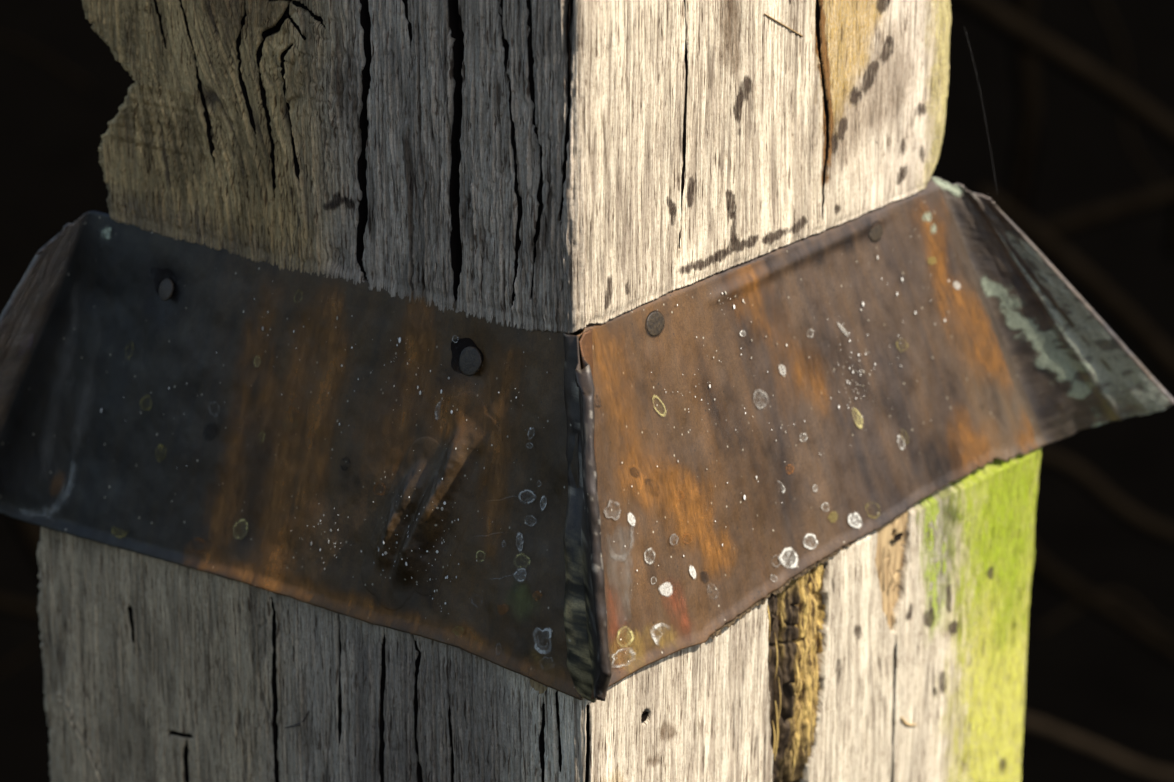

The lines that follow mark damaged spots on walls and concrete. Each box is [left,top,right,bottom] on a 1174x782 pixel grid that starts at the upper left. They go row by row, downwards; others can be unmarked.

crack [236,0,325,195]
crack [356,0,372,279]
crack [402,0,412,47]
crack [448,0,464,303]
crack [815,0,829,214]
crack [271,598,279,782]
crack [379,634,423,782]
crack [447,705,455,782]
leakage [907,604,935,628]
leakage [946,586,958,636]